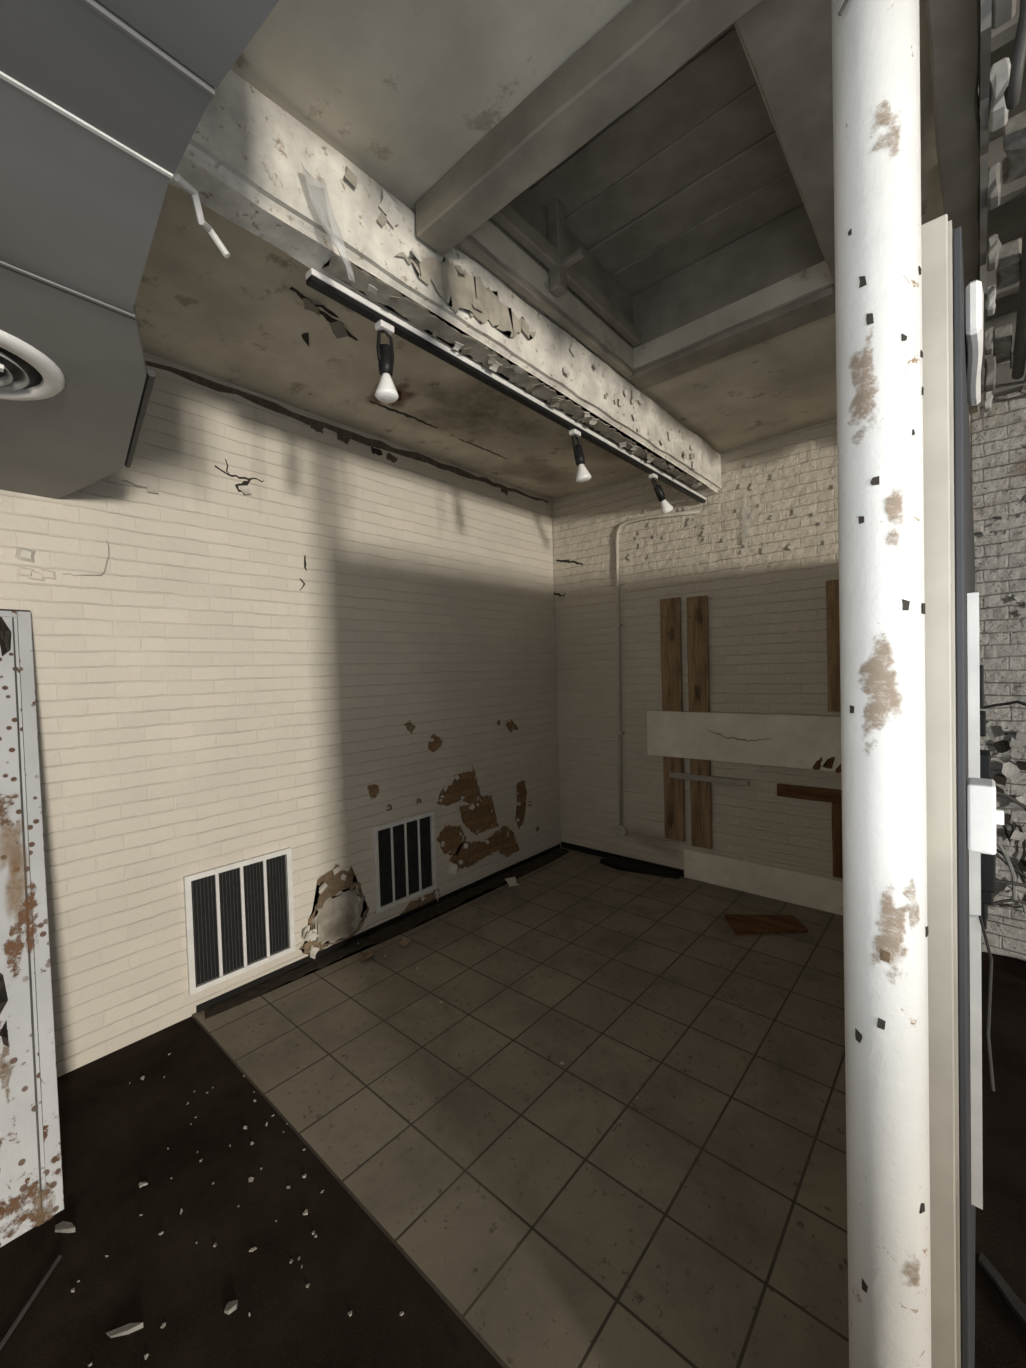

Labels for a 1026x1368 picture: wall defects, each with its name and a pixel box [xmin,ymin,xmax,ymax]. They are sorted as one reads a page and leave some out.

peeling [377,189,402,228]
peeling [321,248,722,491]
corrosion [861,640,902,731]
corrosion [0,794,38,977]
peeling [400,765,539,915]
corrosion [873,880,920,963]
spalling [986,720,1026,908]
corrosion [0,1047,12,1102]
corrosion [0,1183,54,1239]